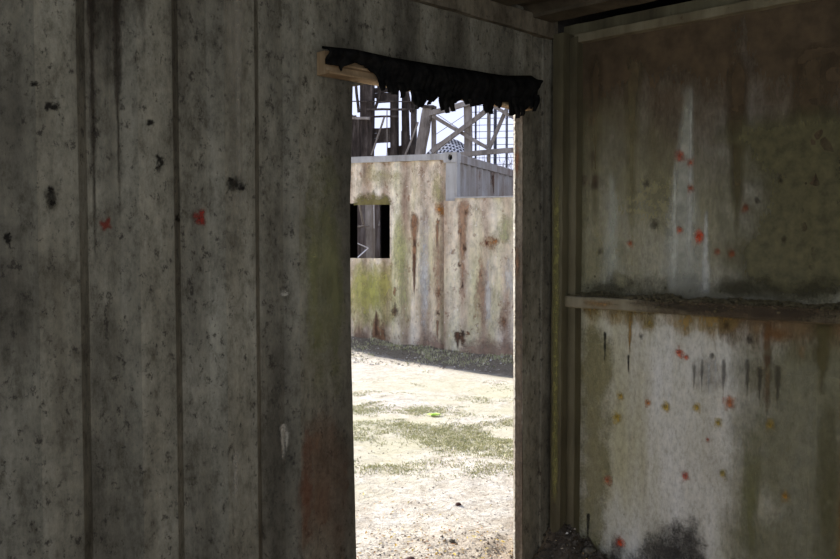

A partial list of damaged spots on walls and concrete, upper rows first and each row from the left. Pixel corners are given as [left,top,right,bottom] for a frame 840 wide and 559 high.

water stain [582,0,840,289]
rust [457,203,469,288]
water stain [641,521,706,559]